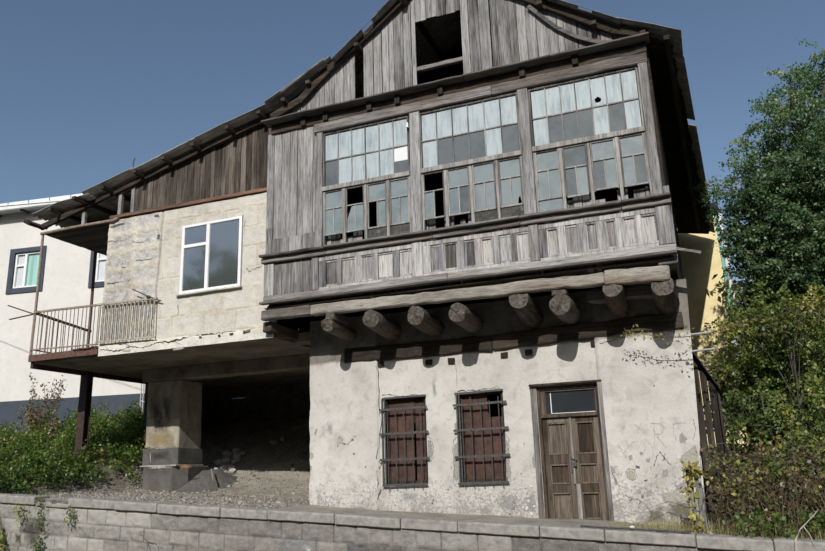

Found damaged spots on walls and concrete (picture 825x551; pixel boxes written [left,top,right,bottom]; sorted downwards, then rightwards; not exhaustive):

flaking render [610,452,668,501]